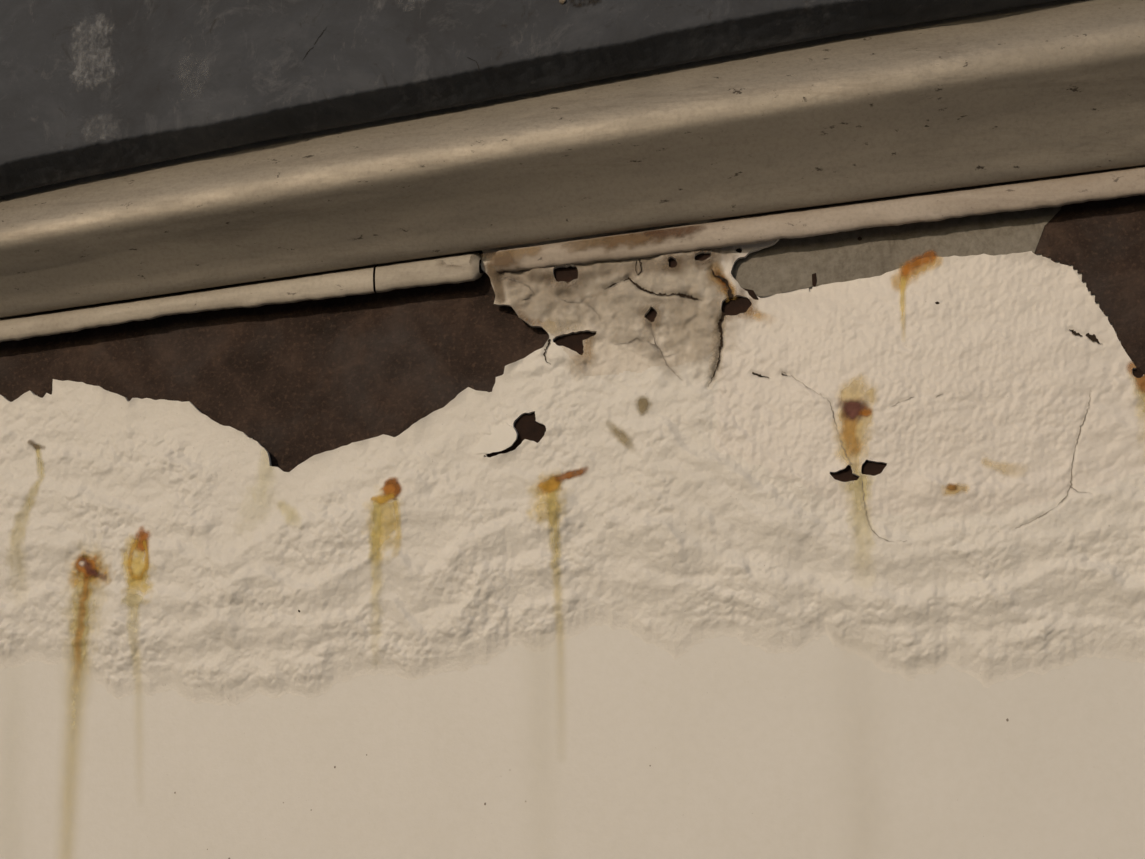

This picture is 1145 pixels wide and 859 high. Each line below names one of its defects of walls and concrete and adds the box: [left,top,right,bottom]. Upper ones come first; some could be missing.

peeling [0,250,549,472]
crack [498,260,733,387]
corrosion [901,251,936,302]
peeling [734,195,1145,374]
corrosion [1128,363,1145,400]
corrosion [840,382,873,487]
corrosion [372,478,400,544]
corrosion [538,469,585,548]
corrosion [73,558,99,663]
corrosion [124,530,148,605]